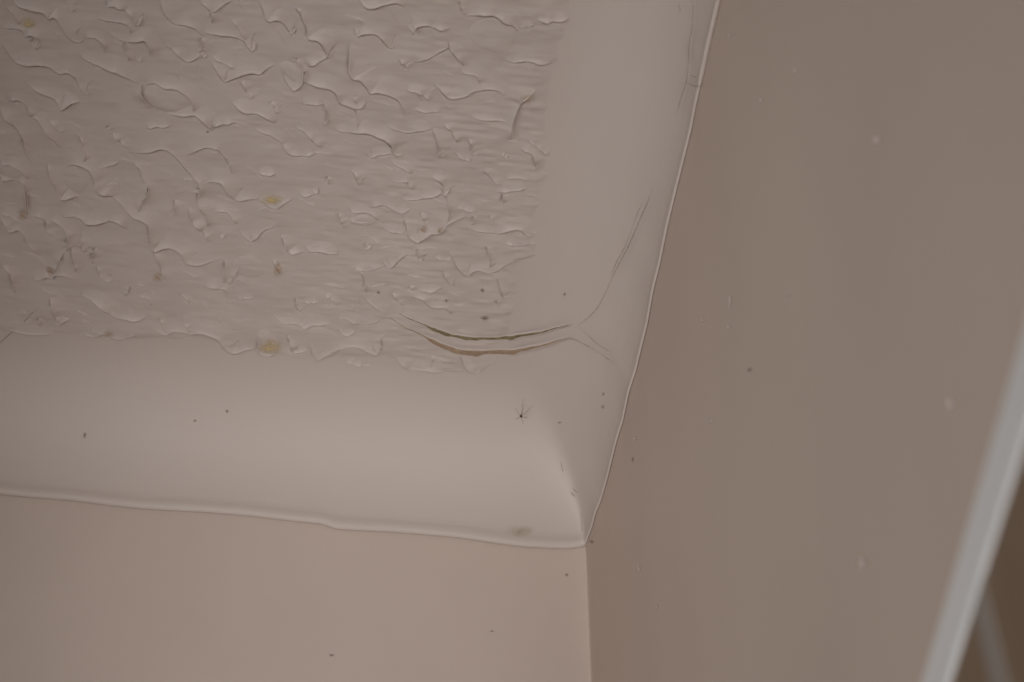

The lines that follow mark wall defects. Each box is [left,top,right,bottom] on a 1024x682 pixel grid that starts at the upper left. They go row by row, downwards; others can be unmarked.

crack [390,313,569,357]